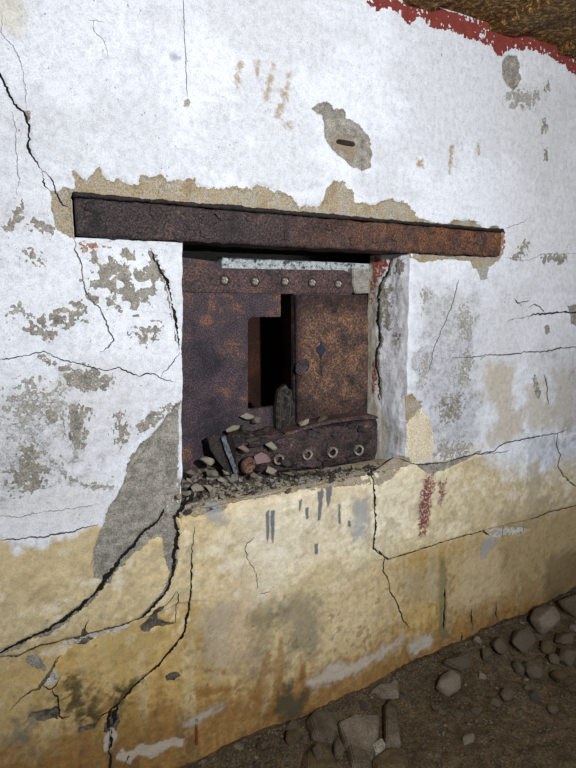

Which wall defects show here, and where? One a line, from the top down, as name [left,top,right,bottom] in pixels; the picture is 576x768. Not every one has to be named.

peeling [367,0,576,111]
crack [0,17,69,208]
spalling [312,101,373,171]
crack [3,238,180,382]
spalling [1,167,530,349]
spalling [0,302,481,580]
rust [233,436,298,472]
damp [299,487,367,540]
rust [316,454,371,467]
crack [0,491,196,768]
damp [273,633,433,719]
damp [103,727,184,764]